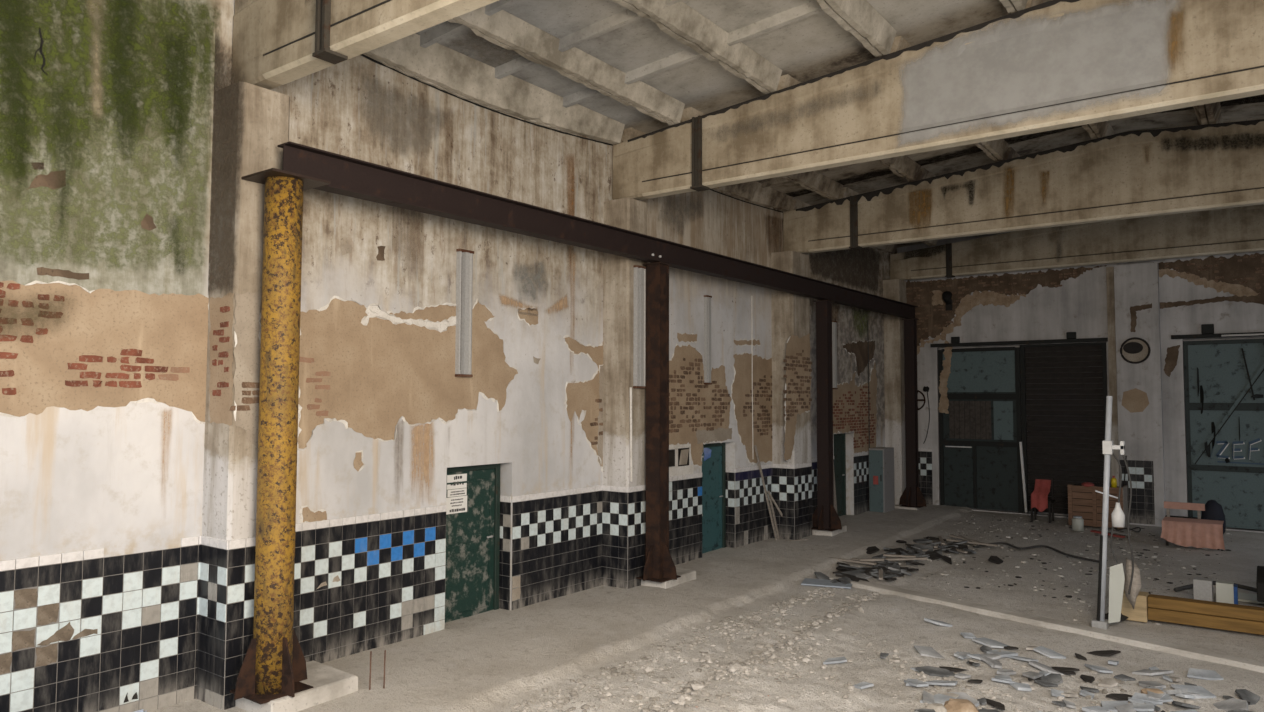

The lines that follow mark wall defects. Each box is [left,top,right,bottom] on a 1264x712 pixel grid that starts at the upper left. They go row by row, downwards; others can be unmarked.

damp [93,42,101,114]
flaking render [1153,253,1264,297]
peeling [0,267,262,448]
peeling [297,296,518,472]
peeling [669,333,812,467]
peeling [833,340,878,453]
flaking render [906,265,1107,414]
spalling [1164,345,1180,377]
peeling [0,588,98,674]